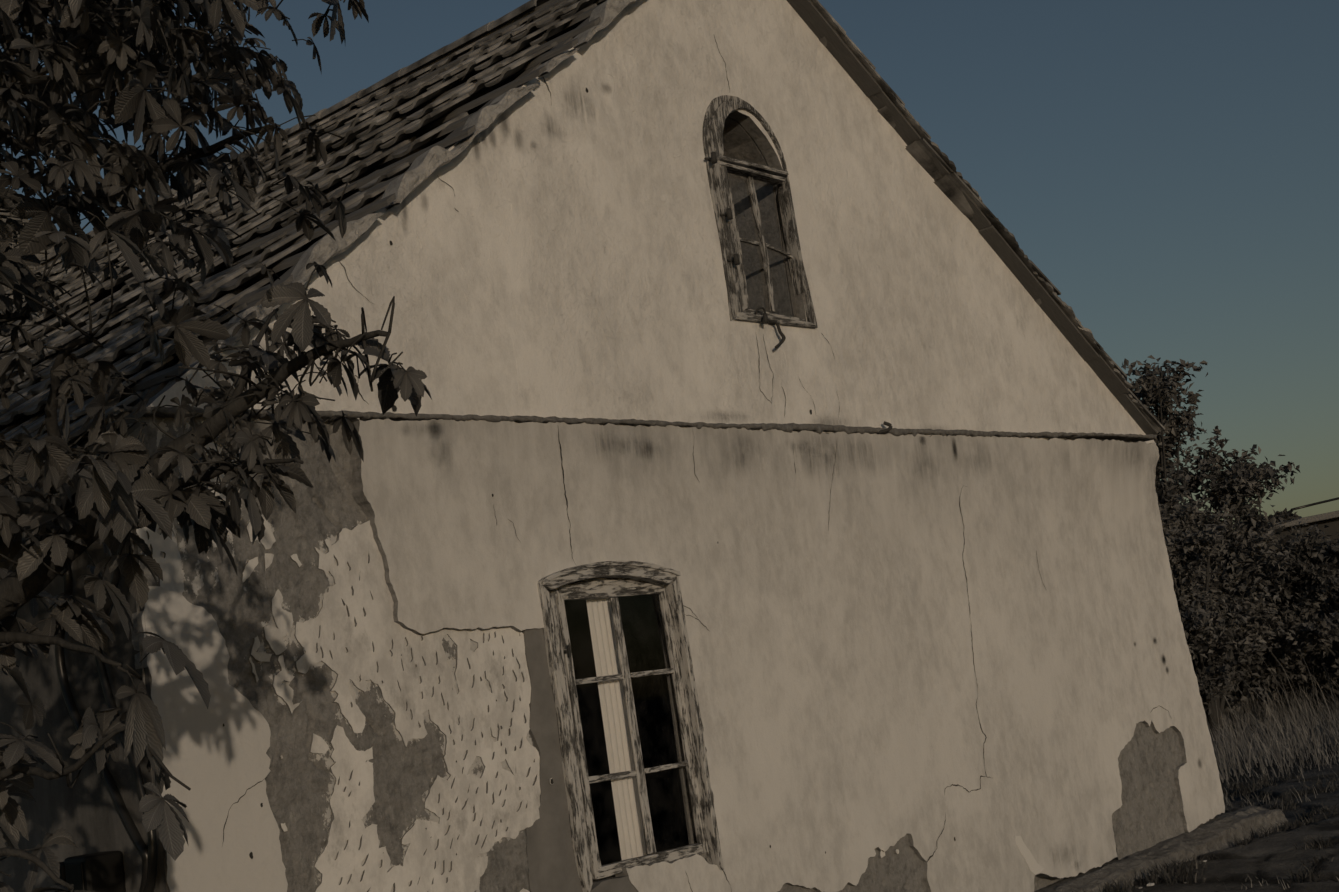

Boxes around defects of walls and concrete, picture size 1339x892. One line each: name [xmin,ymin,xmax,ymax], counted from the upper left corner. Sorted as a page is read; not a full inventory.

crack [558,430,573,559]
spalling [130,416,638,892]
crack [927,485,991,862]
spalling [1112,722,1209,860]
spalling [778,883,816,892]
spalling [838,834,927,892]